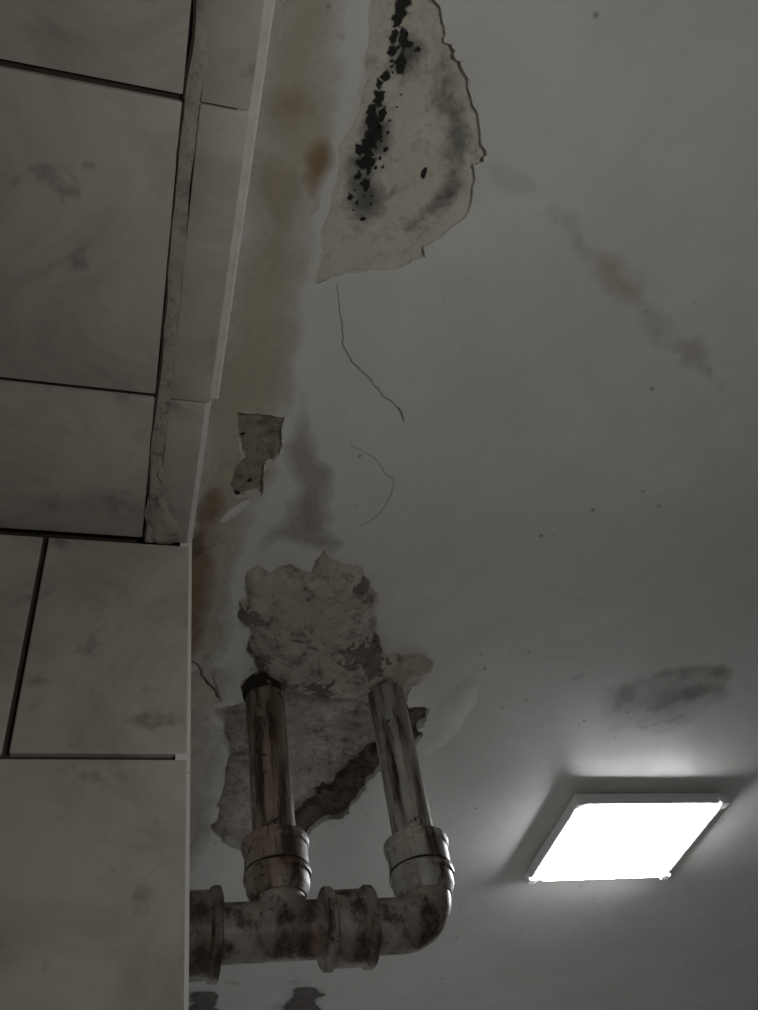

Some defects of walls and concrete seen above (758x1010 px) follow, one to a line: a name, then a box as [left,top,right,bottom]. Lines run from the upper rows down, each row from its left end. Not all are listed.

mould [348,0,421,221]
peeling [312,0,489,286]
water stain [191,0,327,653]
crack [337,290,405,423]
peeling [231,413,283,497]
water stain [190,673,221,845]
spalling [211,702,252,843]
spalling [284,688,379,832]
spalling [404,693,426,740]